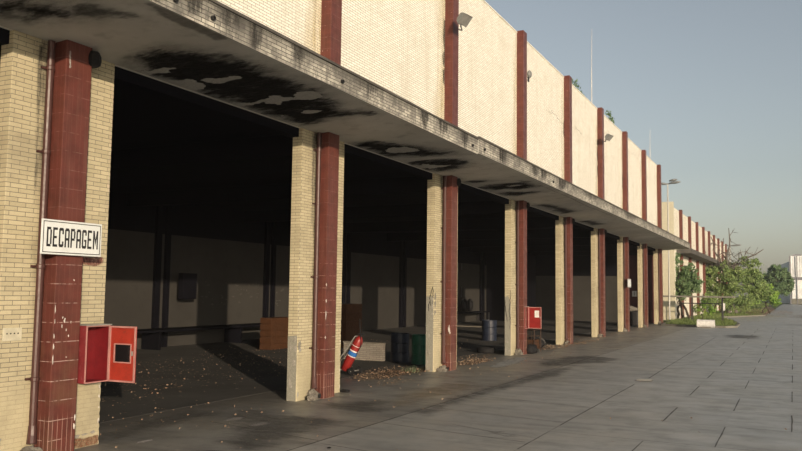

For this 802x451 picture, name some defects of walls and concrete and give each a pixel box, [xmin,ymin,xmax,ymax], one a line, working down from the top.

damp [0,0,68,17]
damp [137,50,374,124]
damp [356,141,467,172]
damp [469,181,535,205]